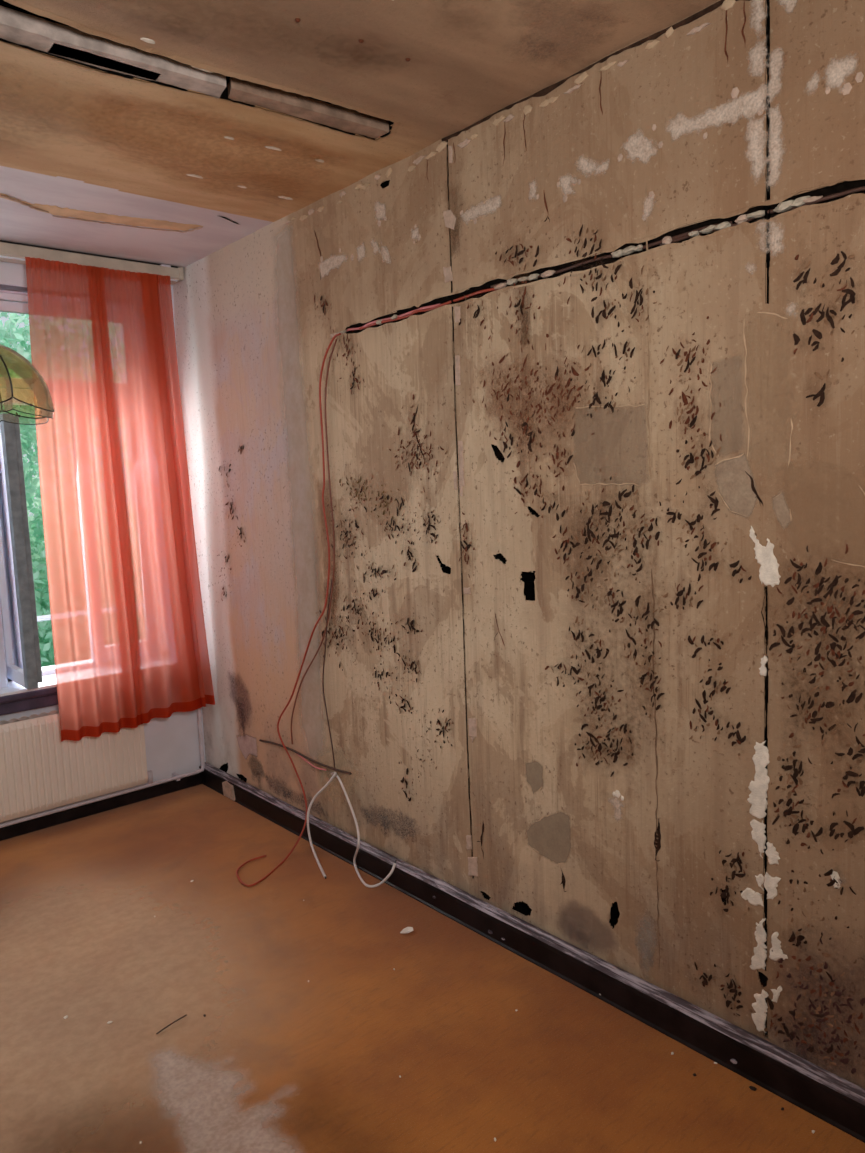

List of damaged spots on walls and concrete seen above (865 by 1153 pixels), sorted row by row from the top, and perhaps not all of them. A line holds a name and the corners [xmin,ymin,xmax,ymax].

peeling [808,72,864,95]
flaking render [537,366,645,413]
crack [286,0,797,878]
flaking render [489,421,639,605]
water stain [319,752,356,794]
crack [741,471,788,1036]
spalling [607,898,623,933]